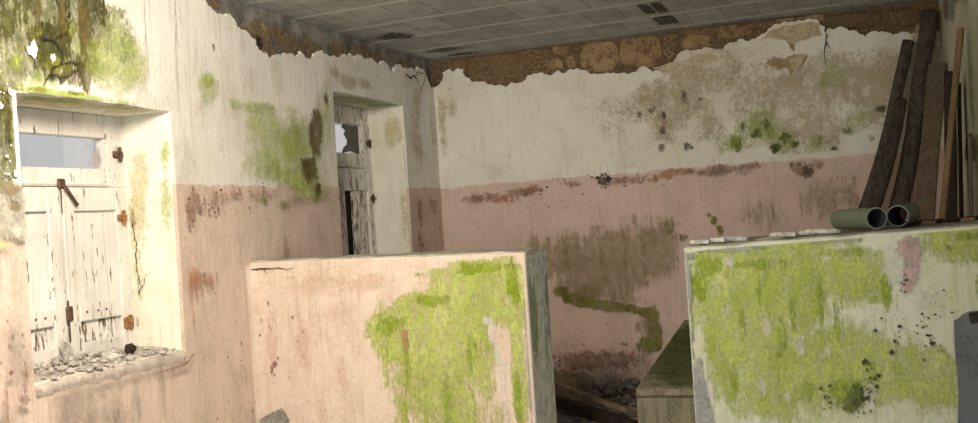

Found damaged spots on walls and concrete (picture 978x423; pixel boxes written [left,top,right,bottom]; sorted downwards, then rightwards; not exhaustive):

water stain [623,52,740,151]
water stain [734,26,919,151]
peeling [463,172,665,213]
water stain [483,315,506,389]
water stain [524,217,770,423]
water stain [818,358,882,414]
water stain [874,302,955,374]